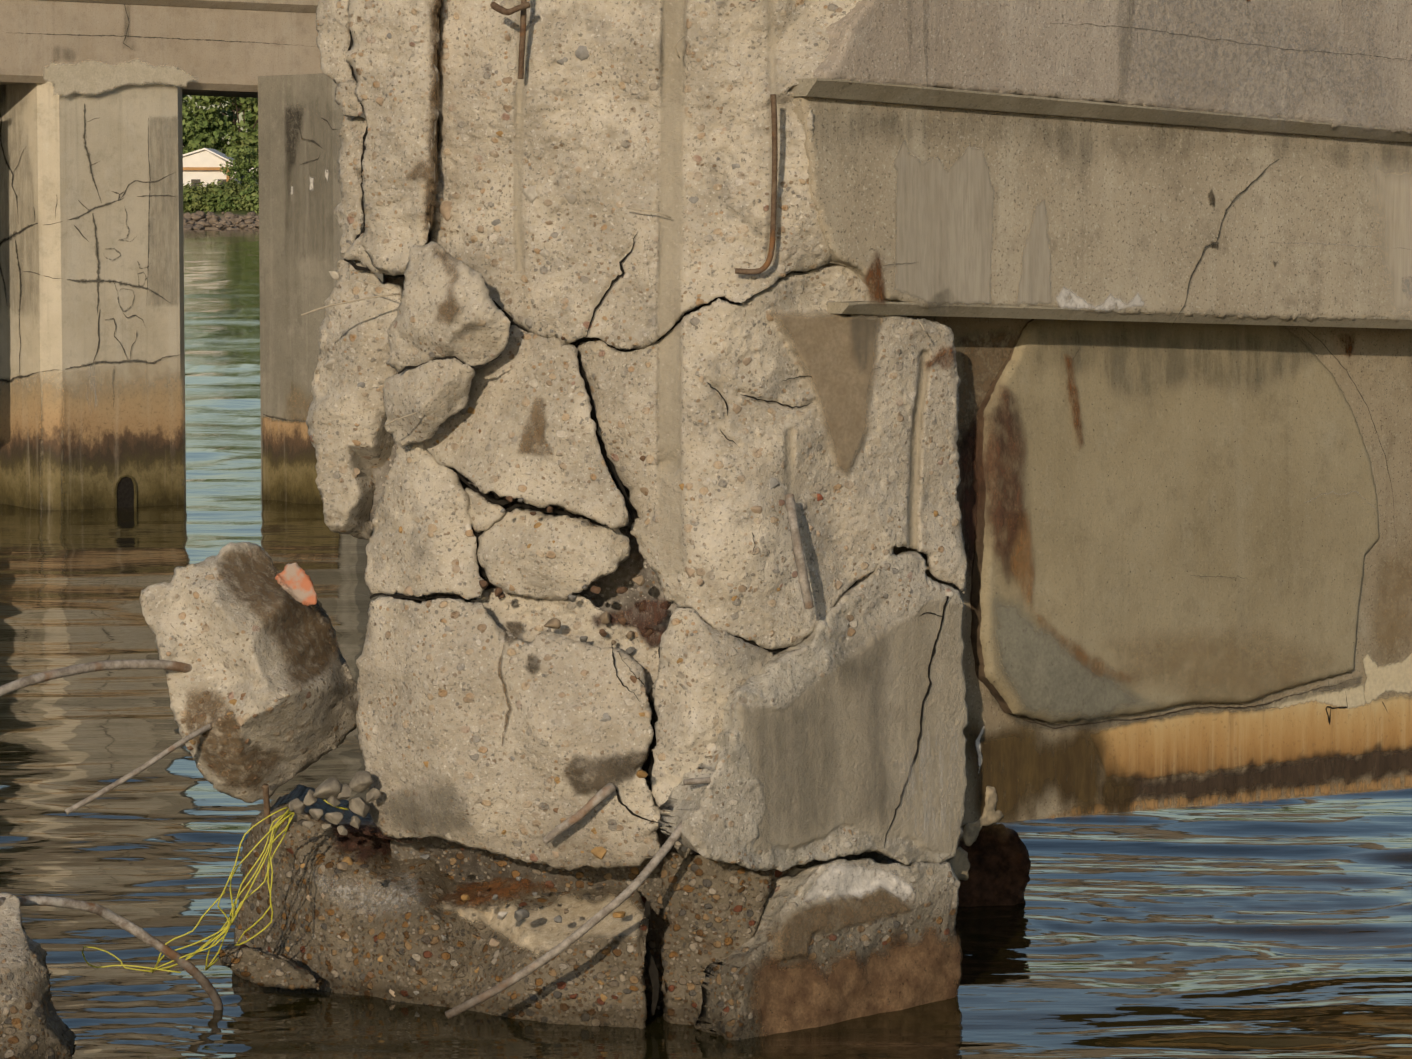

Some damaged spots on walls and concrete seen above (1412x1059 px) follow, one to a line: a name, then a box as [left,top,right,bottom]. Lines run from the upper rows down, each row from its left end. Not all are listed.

spalling [490,0,530,79]
crack [0,105,178,383]
spalling [735,94,778,275]
leakage [0,371,185,510]
crack [370,234,812,601]
rust [960,390,1033,600]
rust [594,599,667,647]
crack [612,643,660,778]
crack [884,596,949,848]
leakage [1094,696,1412,812]
peeling [1261,653,1412,709]
spalling [445,820,682,1019]